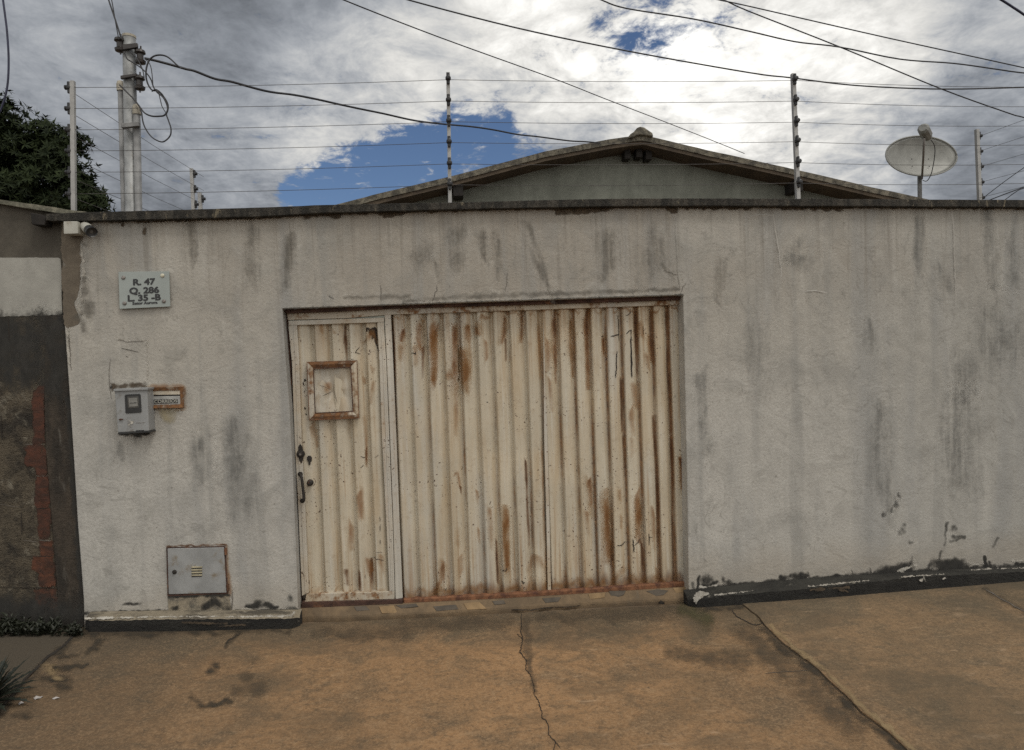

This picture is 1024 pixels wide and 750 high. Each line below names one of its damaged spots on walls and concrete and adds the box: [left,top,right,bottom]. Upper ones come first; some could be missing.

water stain [251,211,464,219]
flaking render [60,222,91,367]
corrosion [392,322,405,383]
corrosion [634,310,668,360]
corrosion [637,416,659,542]
corrosion [670,429,682,567]
corrosion [496,515,509,582]
peeling [693,584,754,604]
peeling [808,580,869,592]
water stain [692,522,1024,589]
peeling [897,564,945,582]
crack [511,604,594,750]